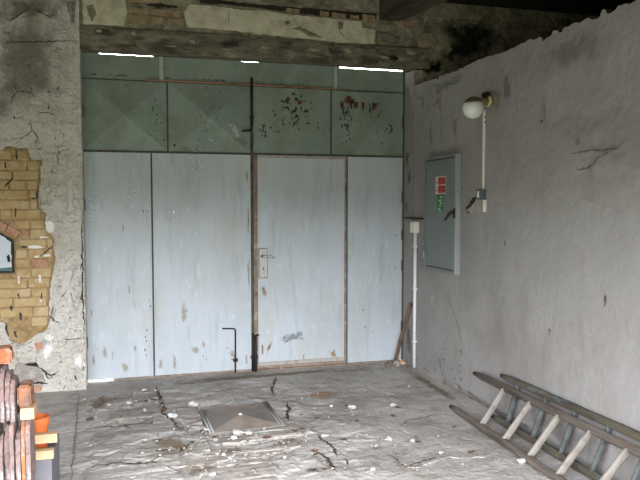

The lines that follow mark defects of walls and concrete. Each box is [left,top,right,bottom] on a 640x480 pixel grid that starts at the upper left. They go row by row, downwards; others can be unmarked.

peeling [82,0,440,60]
damp [447,24,499,61]
peeling [259,93,312,137]
peeling [340,96,382,144]
flaking render [0,147,55,393]
crack [252,377,330,421]
crack [71,386,195,480]
crack [313,434,349,471]